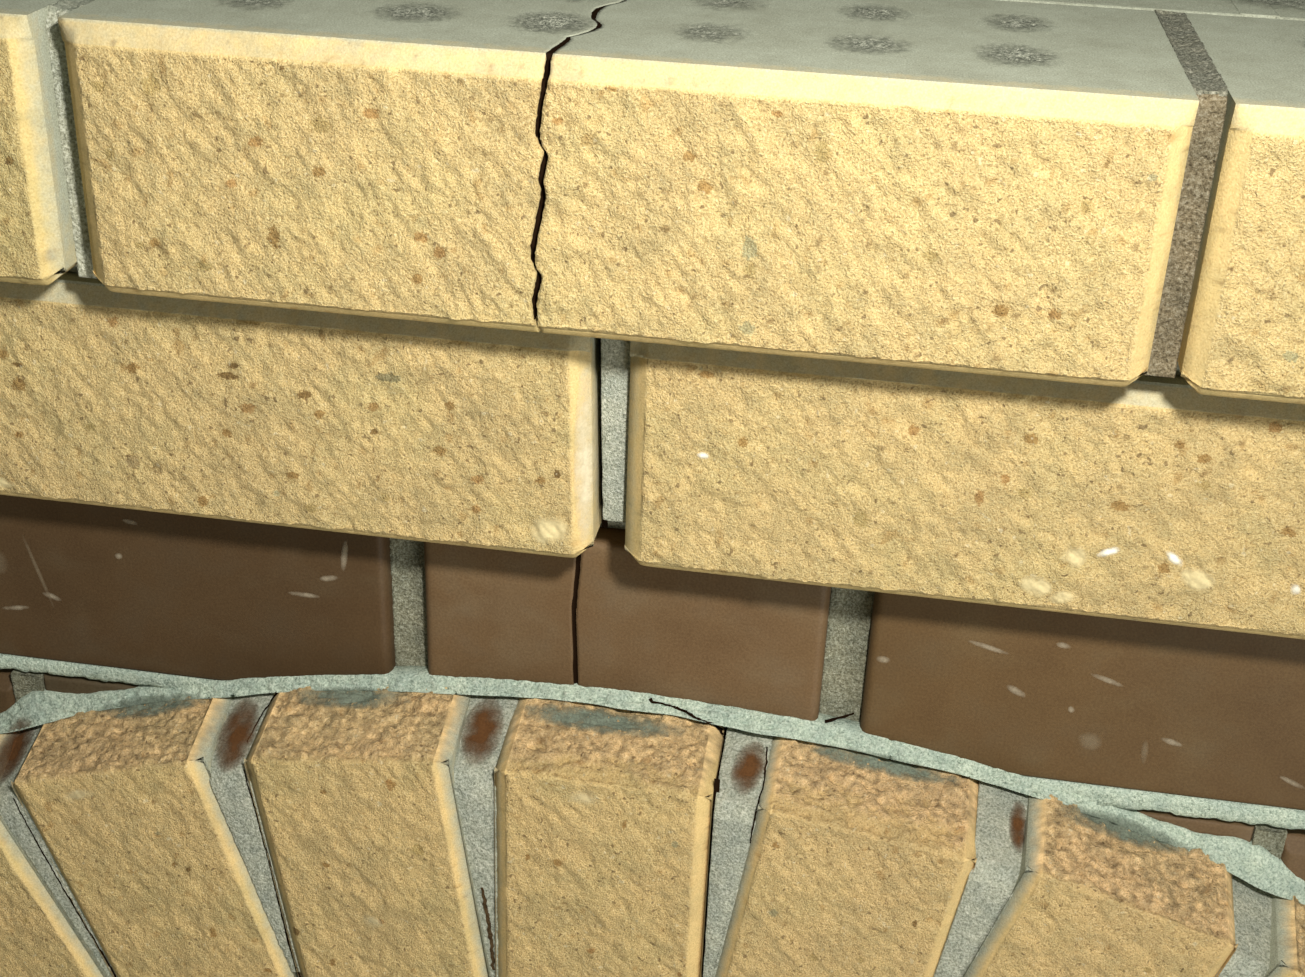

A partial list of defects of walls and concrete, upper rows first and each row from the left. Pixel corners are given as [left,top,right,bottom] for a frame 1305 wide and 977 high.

crack [530,0,625,321]
crack [572,554,581,684]
corrosion [464,707,499,756]
crack [649,698,727,977]
corrosion [734,751,763,788]
corrosion [1011,807,1025,847]